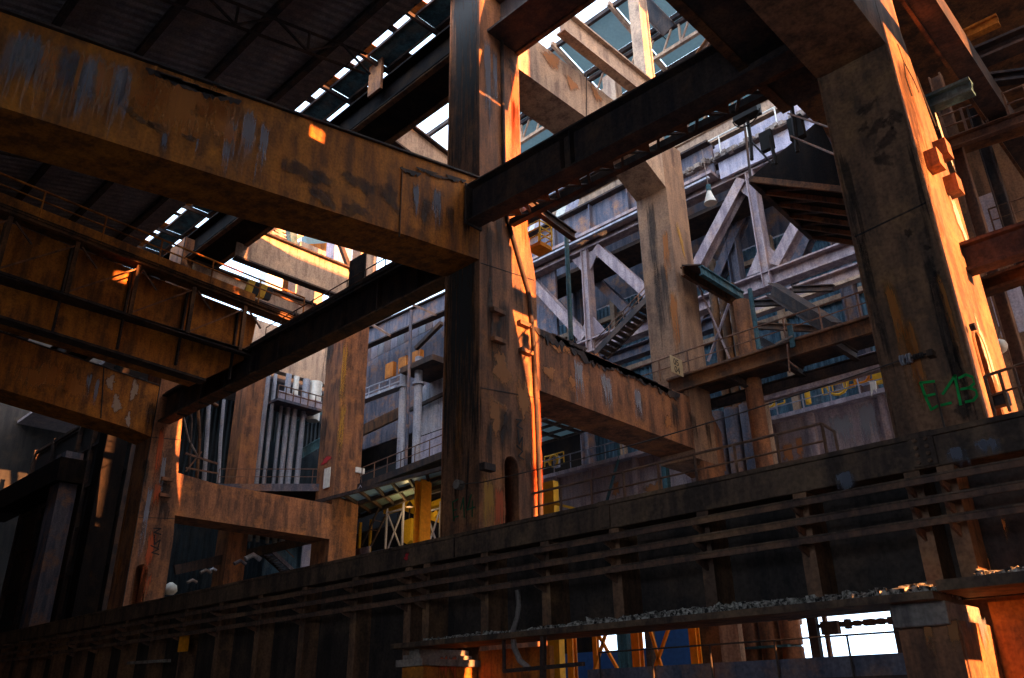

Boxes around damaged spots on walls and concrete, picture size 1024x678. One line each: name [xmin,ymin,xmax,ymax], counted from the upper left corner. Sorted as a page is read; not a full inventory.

leakage [0,33,132,122]
leakage [222,111,269,177]
peeling [106,375,139,427]
peeling [535,327,680,401]